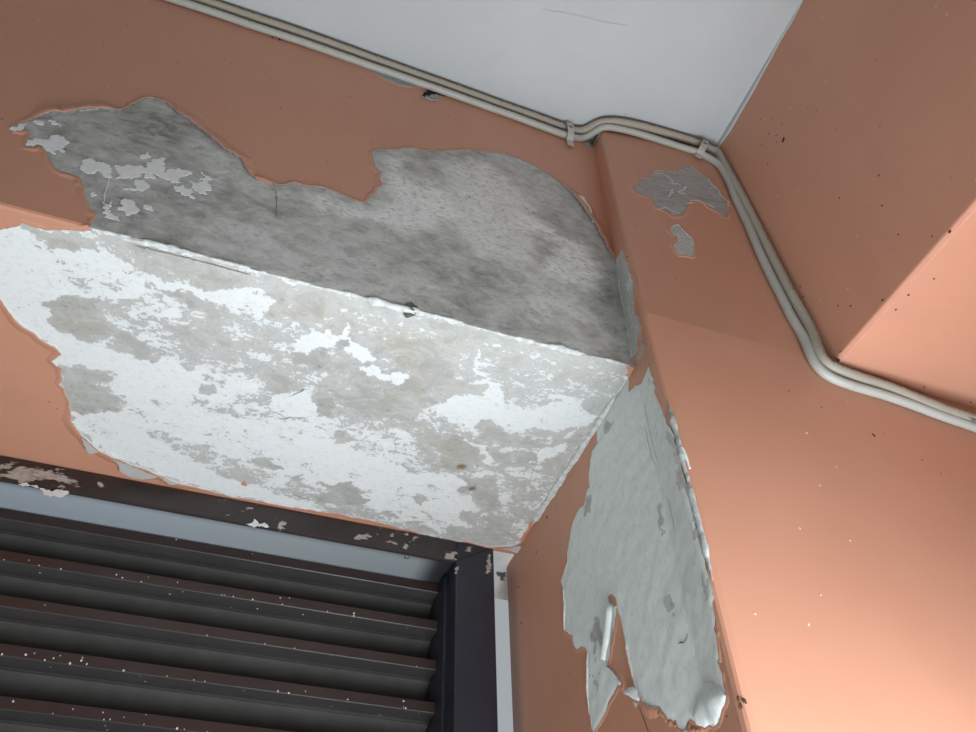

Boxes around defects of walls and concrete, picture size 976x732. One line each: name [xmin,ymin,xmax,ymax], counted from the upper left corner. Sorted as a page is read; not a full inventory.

peeling [0,96,732,732]